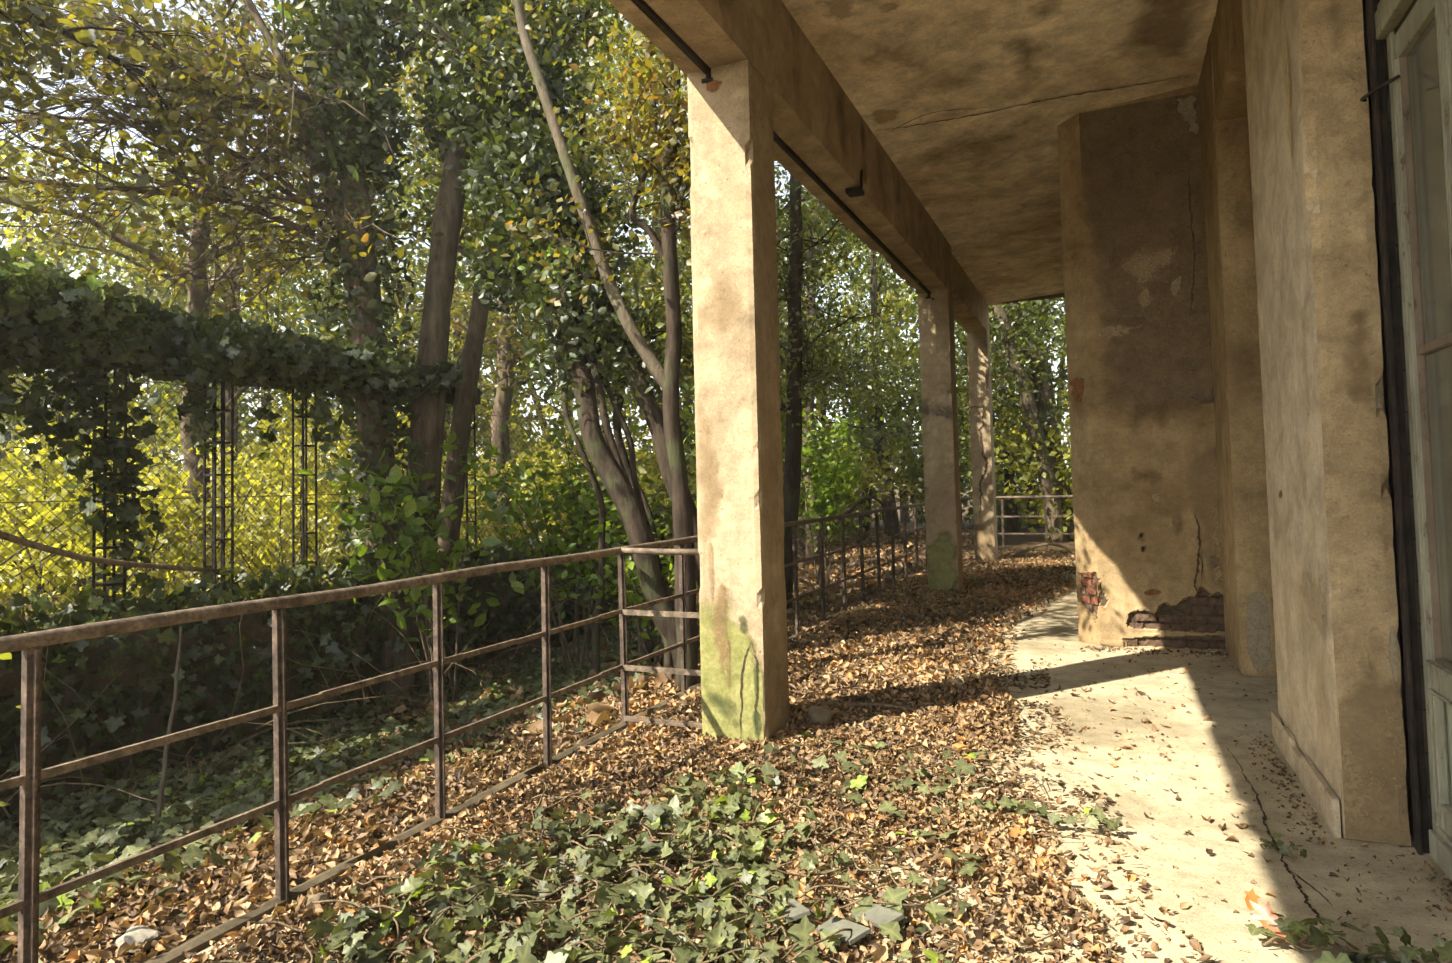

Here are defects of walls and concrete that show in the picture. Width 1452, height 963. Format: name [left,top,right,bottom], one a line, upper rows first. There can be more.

crack [1194,509,1203,594]
flaking render [1080,573,1108,619]
flaking render [1125,588,1226,649]
crack [1227,748,1346,939]